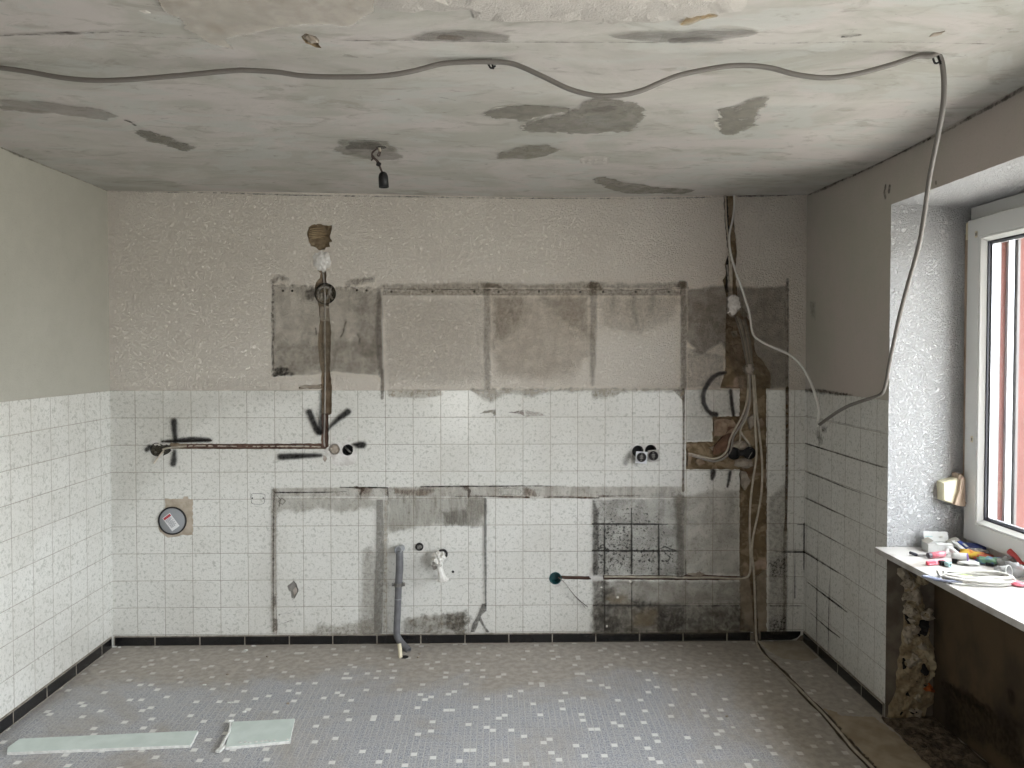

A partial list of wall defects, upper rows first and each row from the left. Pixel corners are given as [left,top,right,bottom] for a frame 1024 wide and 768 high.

leakage [592,503,686,576]